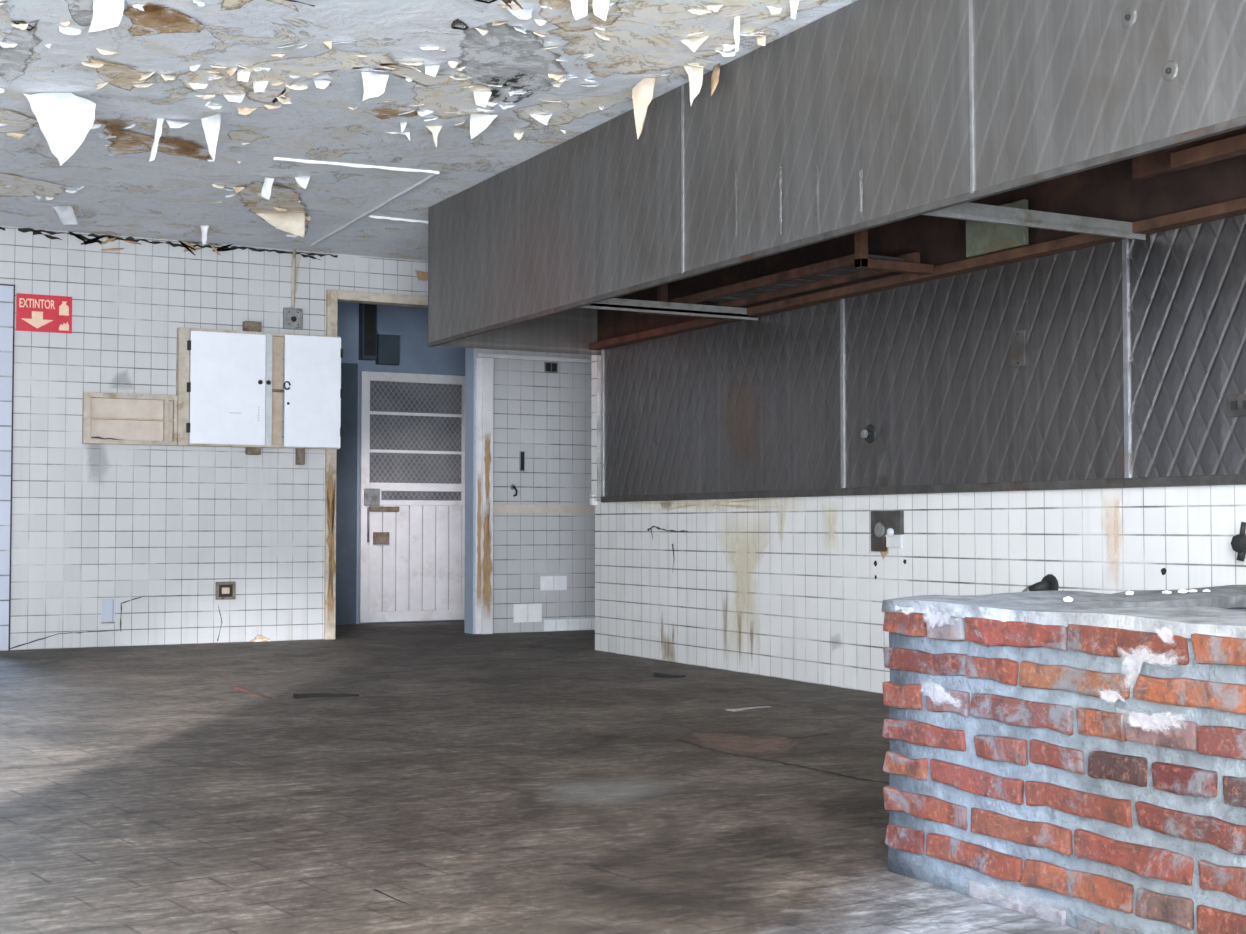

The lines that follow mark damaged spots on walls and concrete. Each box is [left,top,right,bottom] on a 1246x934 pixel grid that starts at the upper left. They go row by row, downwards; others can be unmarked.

peeling [0,0,828,166]
peeling [0,173,142,251]
crack [0,227,338,260]
spalling [179,225,236,255]
peeling [209,176,311,238]
rust [477,439,492,610]